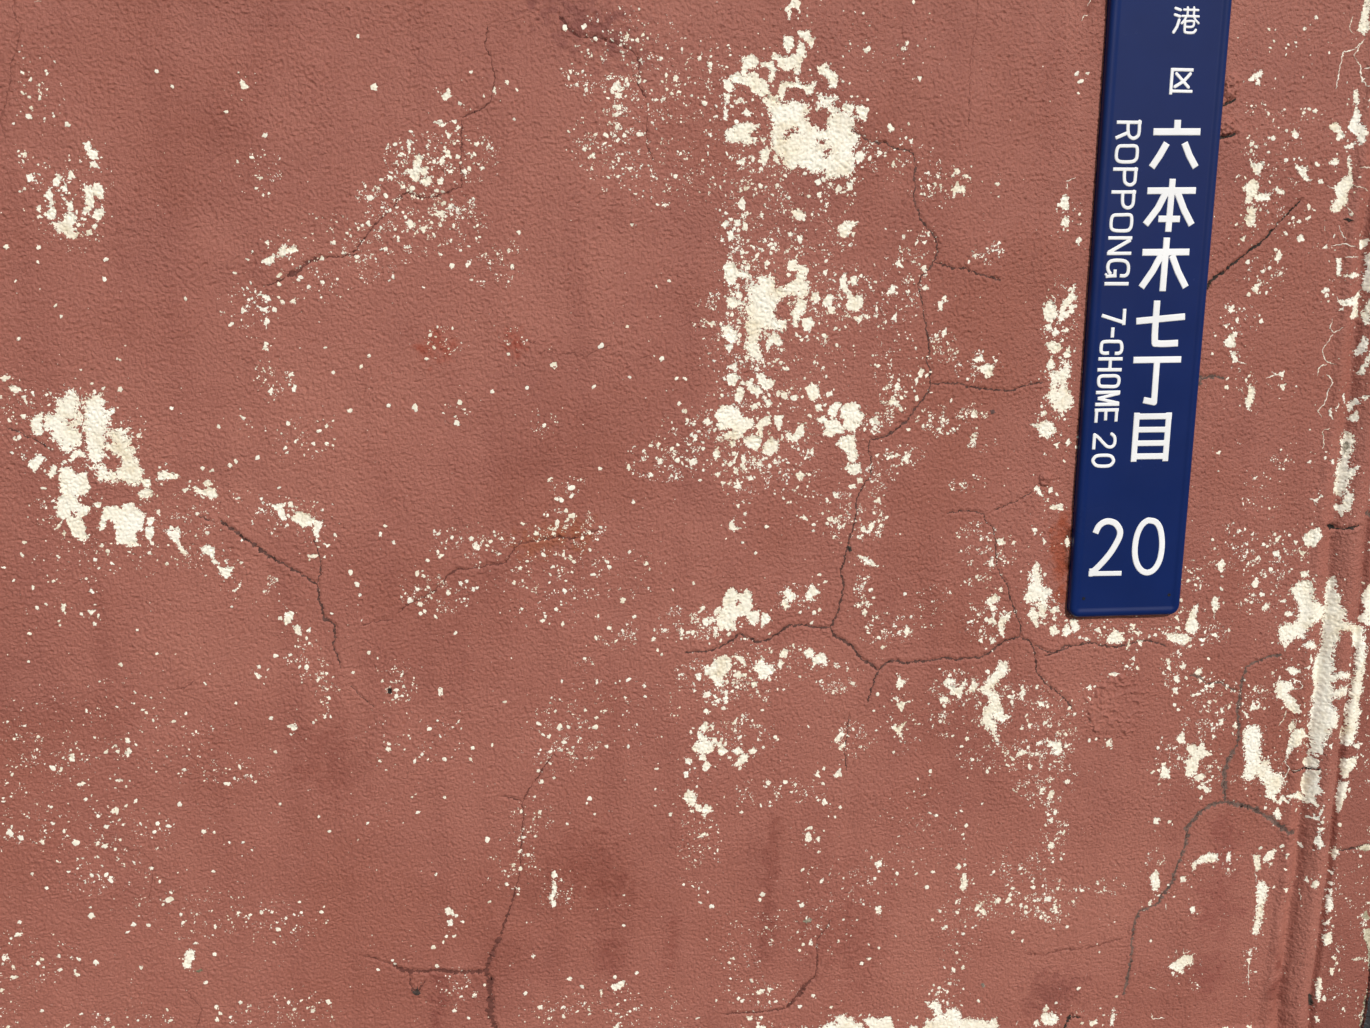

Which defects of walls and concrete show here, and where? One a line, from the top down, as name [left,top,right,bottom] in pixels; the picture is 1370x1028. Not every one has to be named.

peeling [17,139,114,264]
peeling [217,87,521,403]
crack [4,425,53,452]
peeling [0,365,337,626]
peeling [254,575,340,736]
crack [198,516,600,707]
peeling [400,0,1370,1028]
crack [685,131,1165,771]
peeling [0,920,99,1028]
peeling [1,663,329,984]
crack [364,755,553,1028]
crack [1025,653,1295,995]